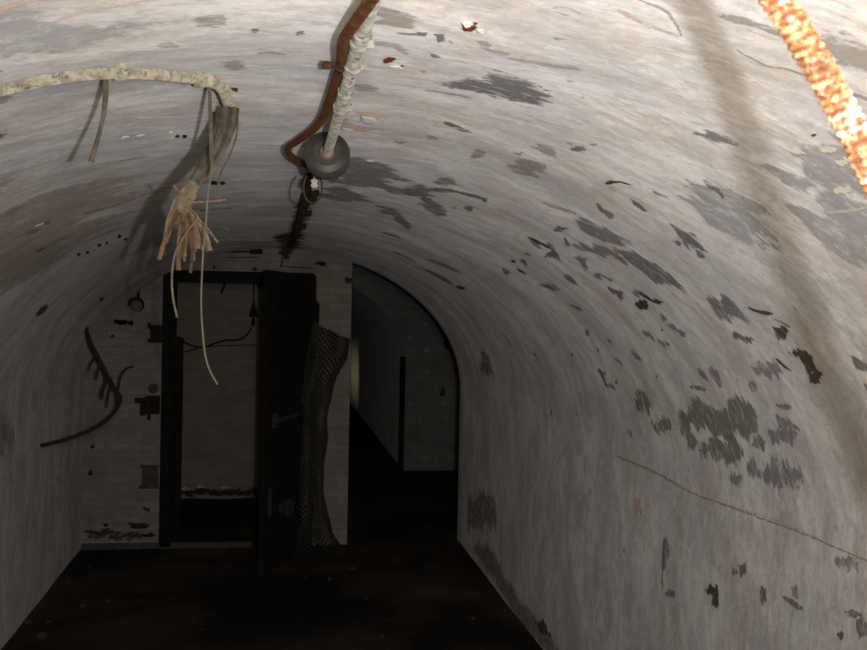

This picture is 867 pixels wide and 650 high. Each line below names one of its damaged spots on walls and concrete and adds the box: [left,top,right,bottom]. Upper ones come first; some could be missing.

spalling [413,32,453,43]
spalling [461,21,576,69]
peeling [426,69,552,106]
peeling [693,130,739,146]
peeling [678,181,780,251]
peeling [765,134,867,269]
peeling [669,223,708,258]
spalling [705,293,791,345]
spalling [788,348,822,384]
spalling [852,356,867,371]
peeling [635,358,802,493]
crack [616,455,867,562]